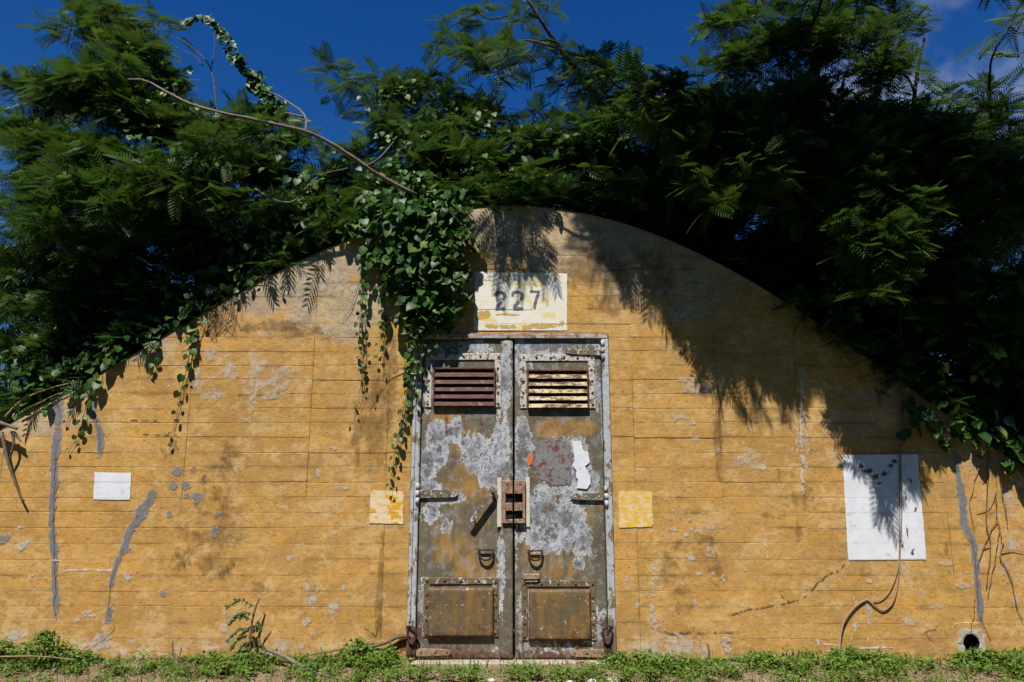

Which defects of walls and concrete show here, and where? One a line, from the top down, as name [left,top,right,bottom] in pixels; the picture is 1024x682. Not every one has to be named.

peeling [191,349,222,401]
peeling [220,353,291,408]
crack [48,391,105,623]
spalling [167,465,203,503]
crack [87,489,157,648]
crack [666,563,845,635]
crack [924,449,991,644]